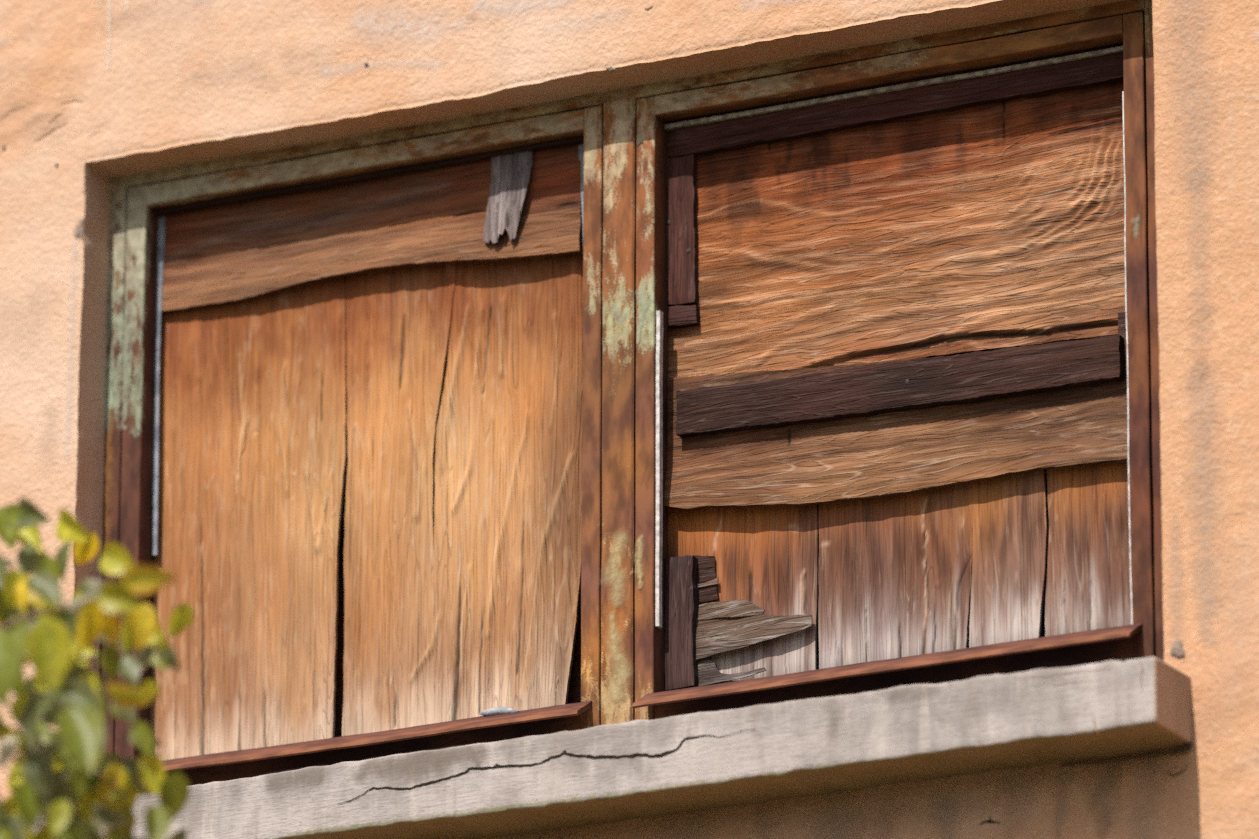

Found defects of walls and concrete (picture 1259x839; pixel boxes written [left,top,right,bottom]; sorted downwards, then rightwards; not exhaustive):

crack [339,729,755,804]